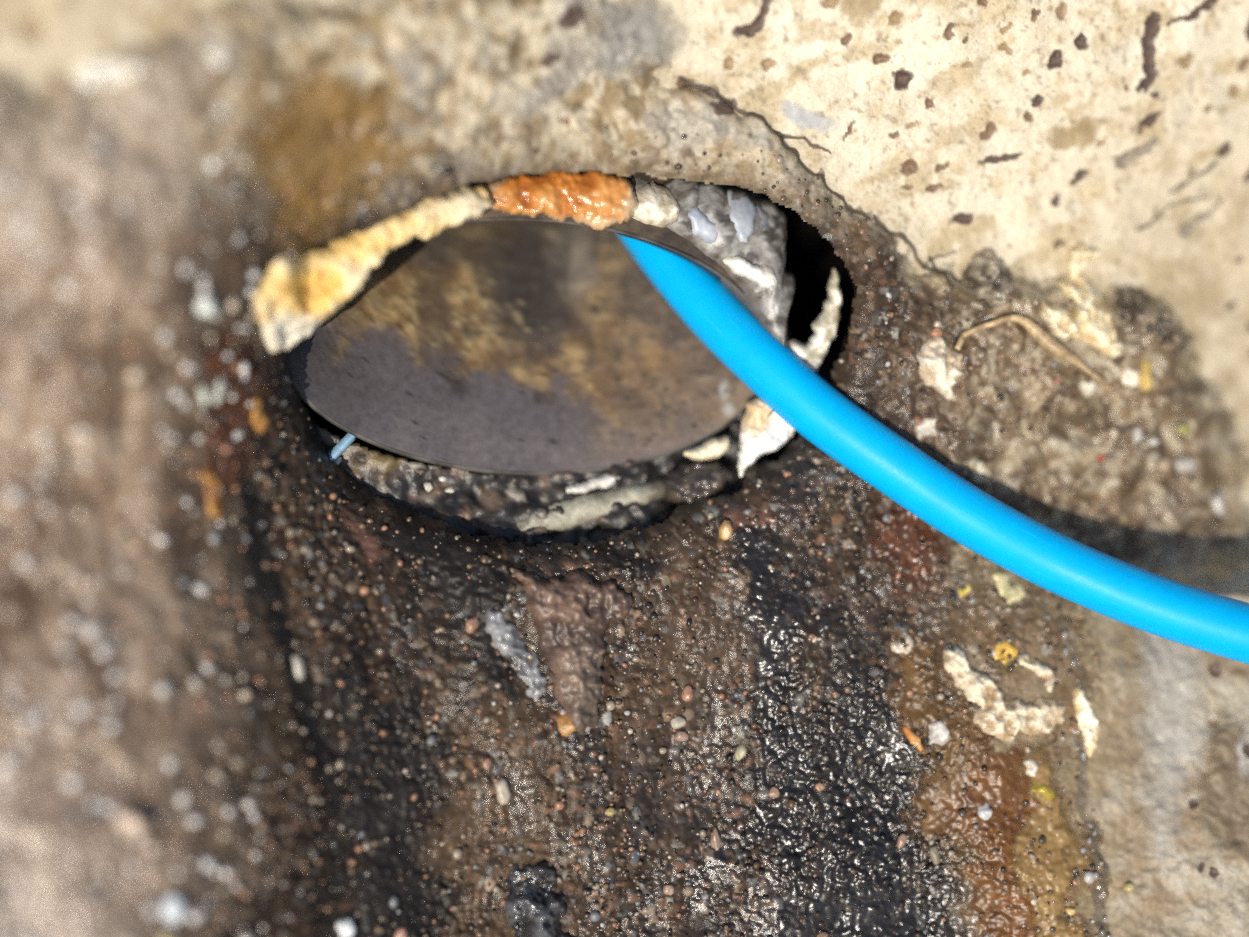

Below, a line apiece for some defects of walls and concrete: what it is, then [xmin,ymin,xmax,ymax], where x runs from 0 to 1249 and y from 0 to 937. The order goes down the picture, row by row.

corrosion [483,170,639,230]
peeling [688,207,718,244]
peeling [727,188,770,243]
crack [678,76,971,339]
leakage [370,522,519,704]
leakage [585,545,660,581]
leakage [240,481,459,937]
leakage [731,527,956,937]